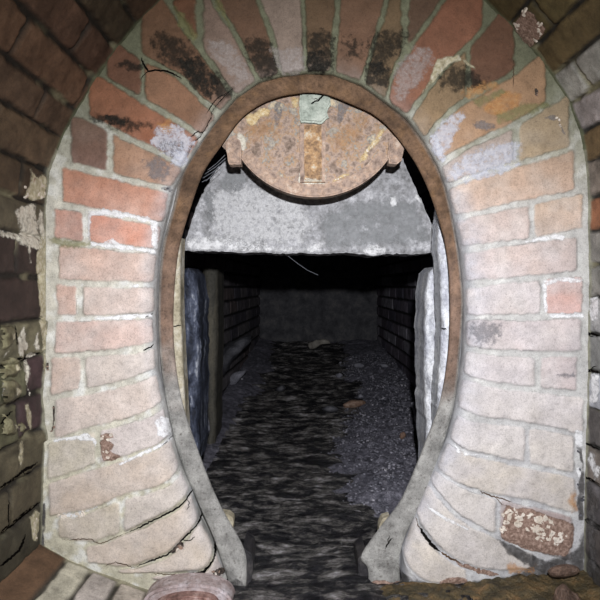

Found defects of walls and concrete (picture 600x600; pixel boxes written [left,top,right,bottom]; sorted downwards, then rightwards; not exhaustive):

spalling [513,7,545,47]
crack [141,58,182,79]
leakage [180,57,219,100]
leakage [366,62,389,87]
leakage [425,55,474,90]
leakage [150,124,195,166]
peeling [0,173,47,253]
spalling [100,433,121,461]
spalling [499,449,585,557]
crack [64,490,203,575]
crack [190,541,217,573]
crack [415,517,463,564]